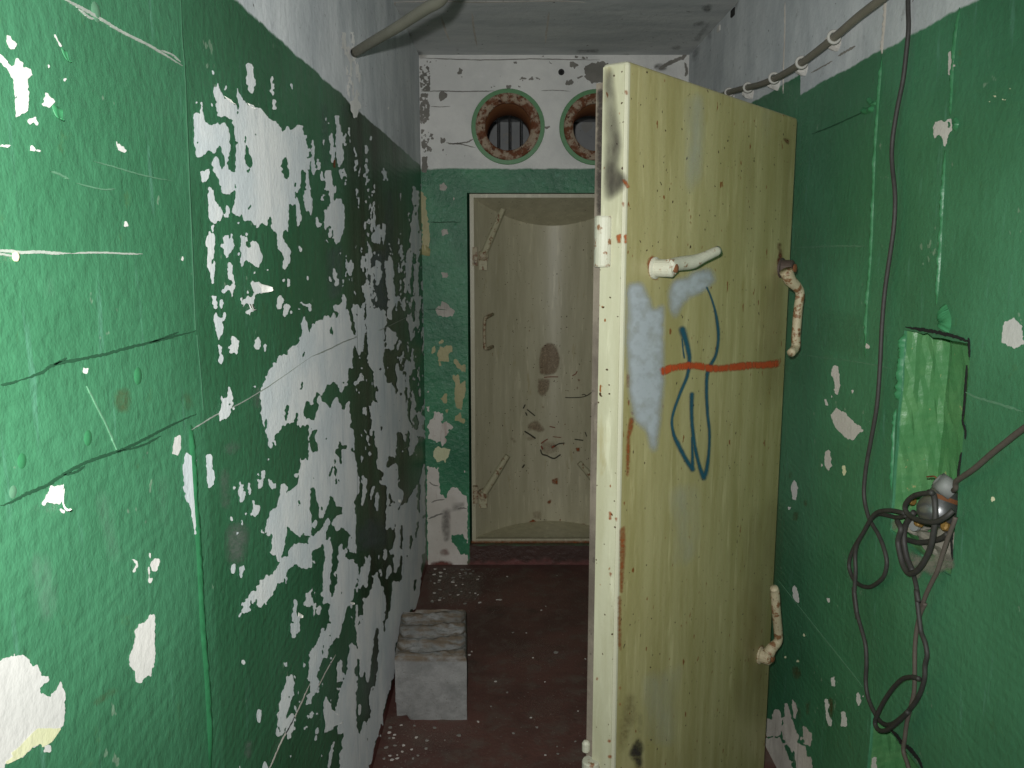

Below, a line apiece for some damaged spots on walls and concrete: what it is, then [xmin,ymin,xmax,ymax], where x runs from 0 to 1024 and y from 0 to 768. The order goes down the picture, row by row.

peeling [0,35,38,125]
peeling [42,93,64,121]
peeling [565,56,608,85]
peeling [933,119,952,146]
peeling [1002,318,1024,349]
peeling [193,32,468,768]
peeling [824,365,863,440]
peeling [172,435,215,534]
peeling [129,614,156,683]
peeling [0,654,66,768]
peeling [765,700,813,768]